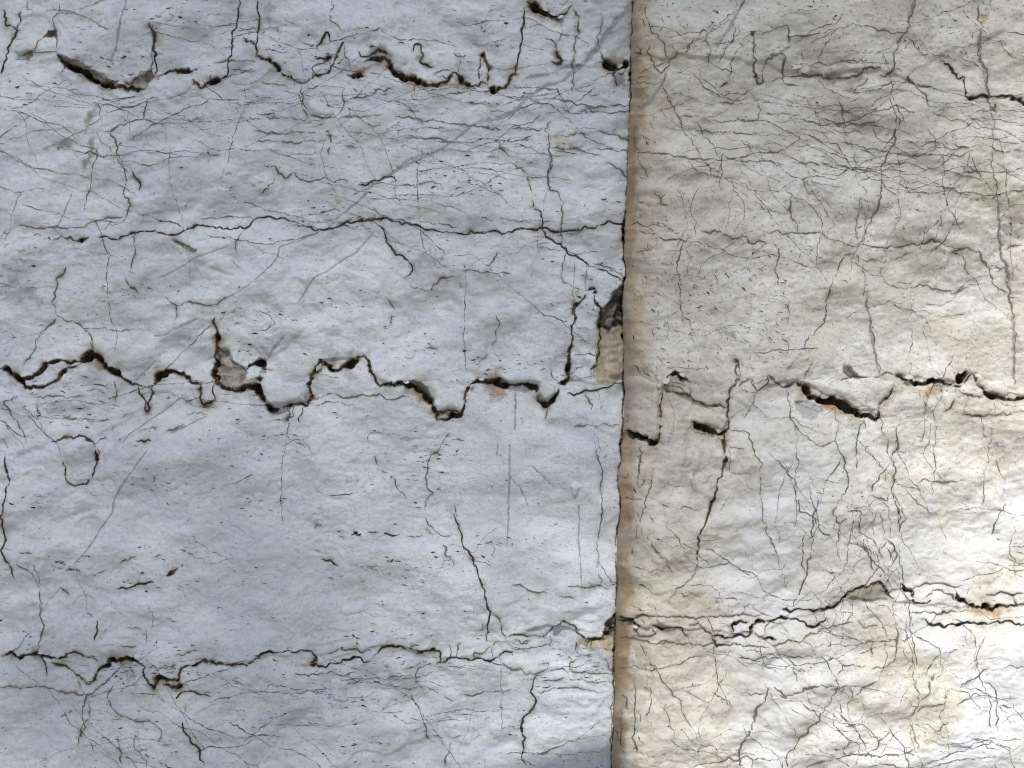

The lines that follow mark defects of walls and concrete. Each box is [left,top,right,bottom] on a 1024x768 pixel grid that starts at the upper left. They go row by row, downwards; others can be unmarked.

spalling [64,58,155,92]
spalling [218,346,259,390]
crack [0,0,1024,606]
peeling [593,283,624,384]
spalling [843,365,858,378]
crack [0,297,354,768]
crack [330,356,1024,768]